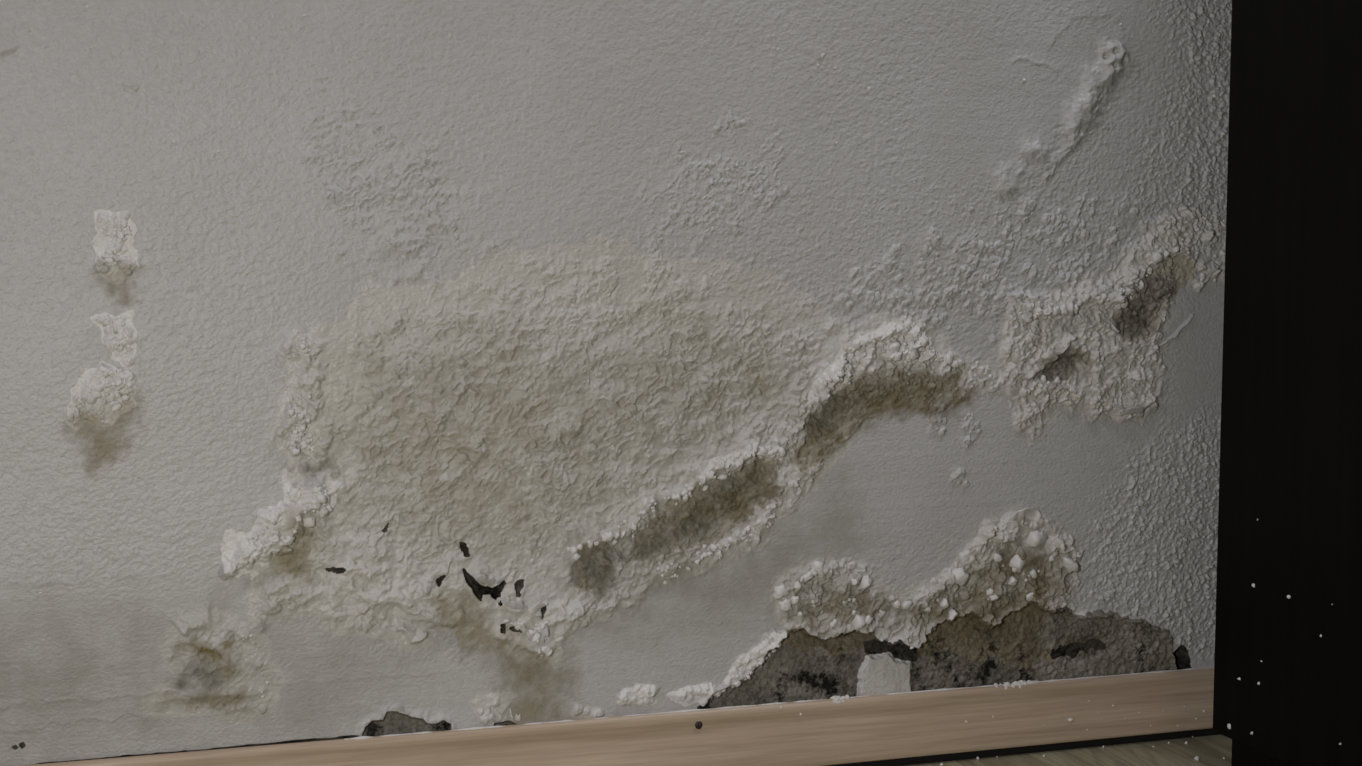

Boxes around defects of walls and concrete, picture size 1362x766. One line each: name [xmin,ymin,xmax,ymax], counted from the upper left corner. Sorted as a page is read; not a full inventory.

peeling [548,207,1226,635]
flaking render [697,603,1192,709]
flaking render [362,706,452,736]